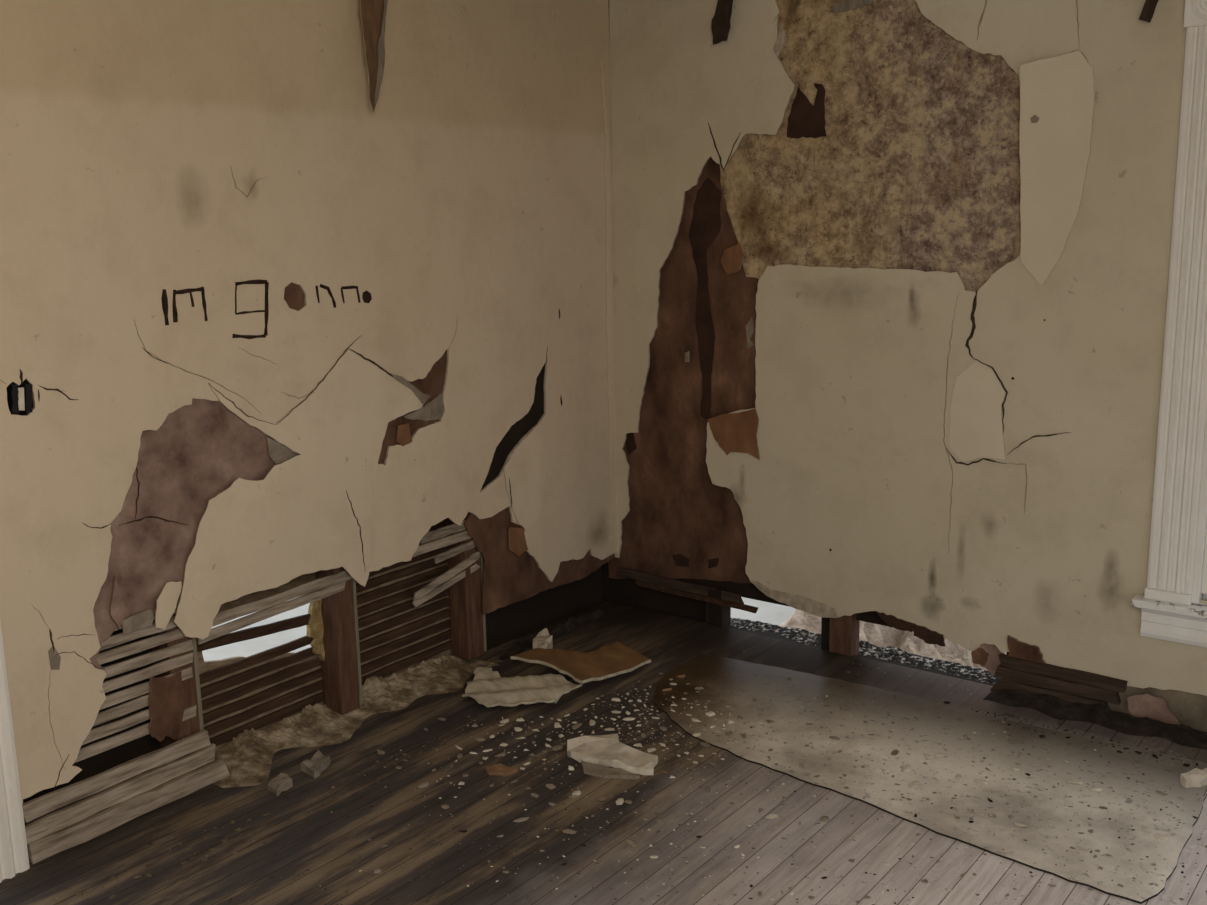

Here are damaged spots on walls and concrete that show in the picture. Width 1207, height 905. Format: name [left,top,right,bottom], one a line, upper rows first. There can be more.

crack [38,385,79,400]
crack [134,319,259,412]
crack [481,348,562,530]
flaking render [464,0,1095,651]
crack [943,290,1069,552]
flaking render [23,317,458,803]
flaking render [1107,686,1207,732]